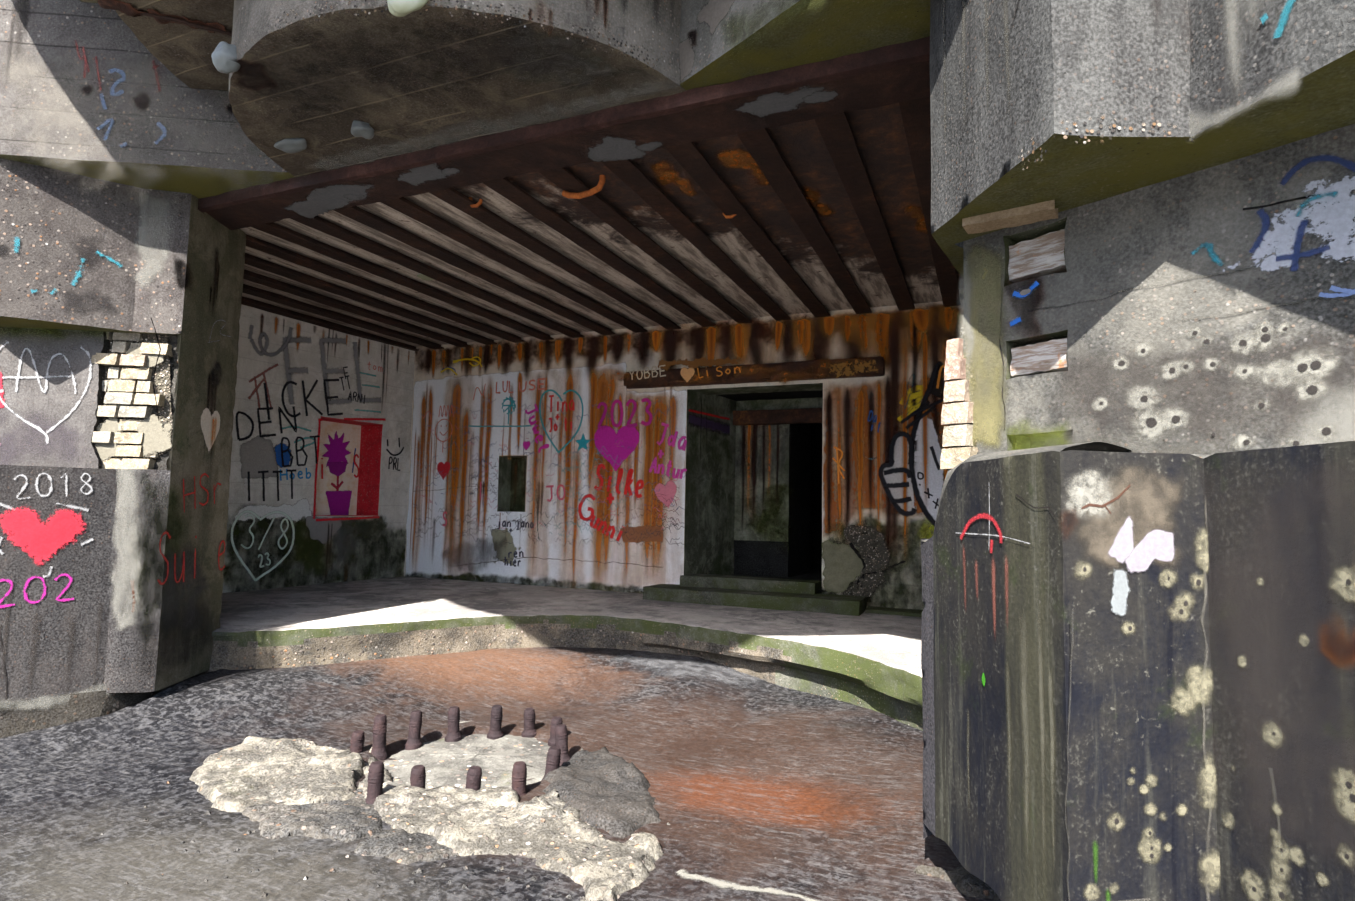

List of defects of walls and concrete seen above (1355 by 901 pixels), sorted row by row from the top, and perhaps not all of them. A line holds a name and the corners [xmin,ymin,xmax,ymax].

corrosion [652,163,695,195]
corrosion [717,150,770,185]
spalling [91,331,177,628]
corrosion [260,305,963,580]
crack [998,287,1006,430]
crack [1036,264,1261,310]
crack [1182,296,1355,320]
peeling [1289,399,1355,446]
peeling [1067,469,1204,634]
damp [1224,511,1282,813]
damp [1007,620,1054,851]
spalling [1128,768,1187,861]